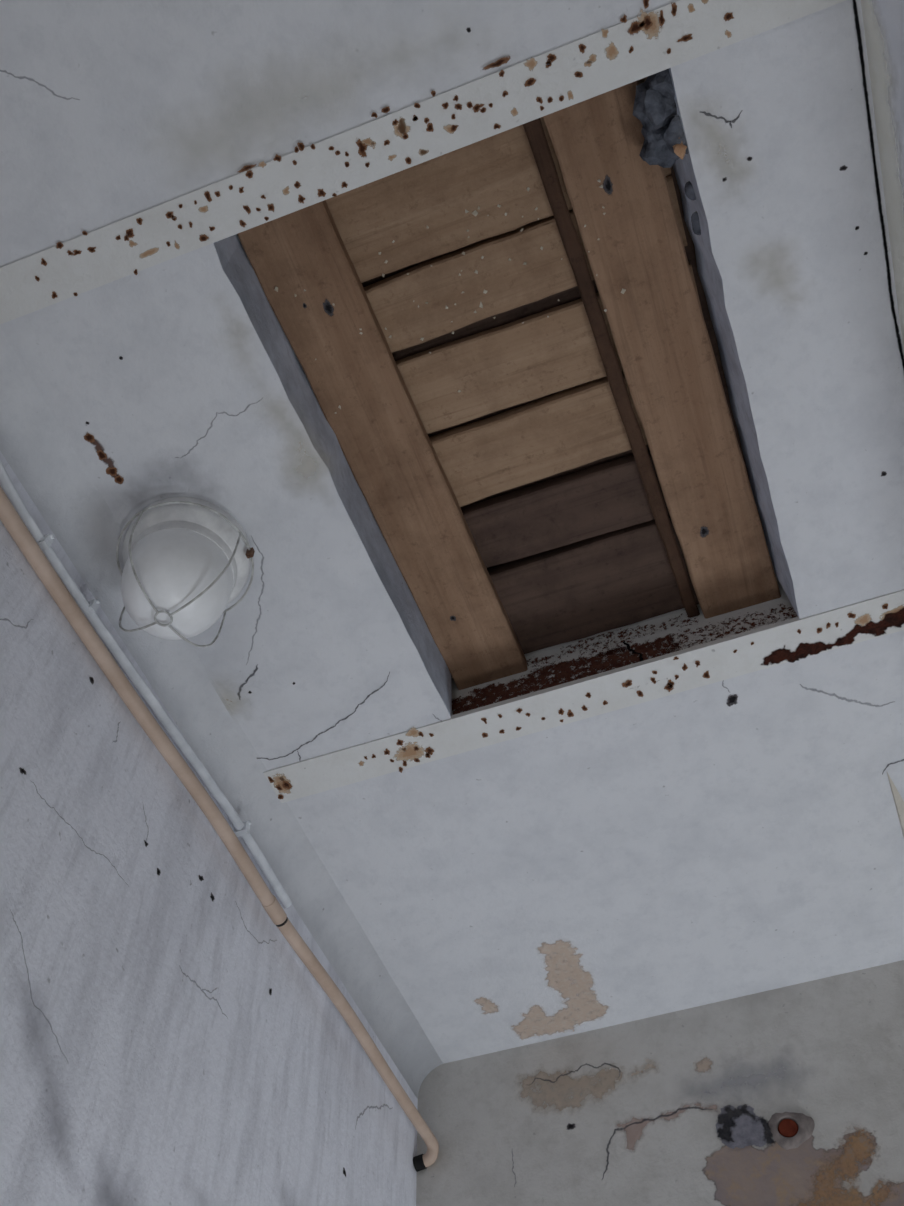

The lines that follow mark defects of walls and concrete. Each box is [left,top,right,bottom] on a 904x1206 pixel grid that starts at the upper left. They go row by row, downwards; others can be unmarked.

rust [524,0,708,111]
rust [116,56,518,276]
rust [56,231,96,256]
rust [83,433,124,484]
rust [452,603,904,738]
rust [268,774,292,799]
crack [257,672,390,762]
rust [358,728,434,773]
peeling [475,997,498,1014]
peeling [512,940,608,1040]
peeling [522,1063,655,1110]
peeling [702,1104,904,1206]